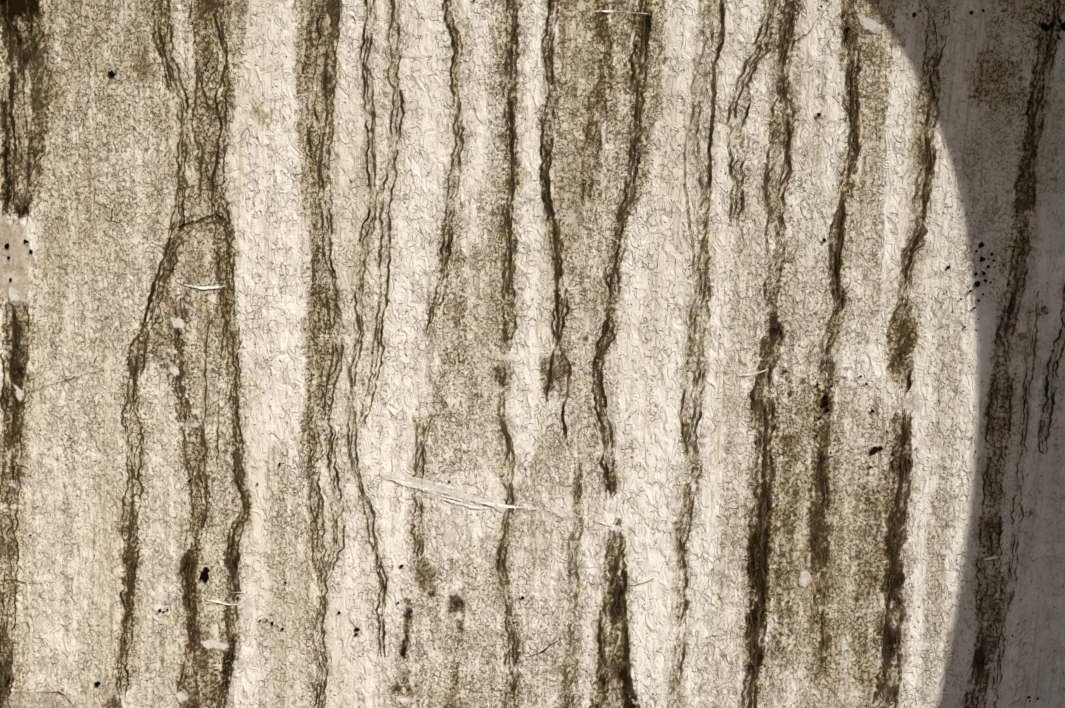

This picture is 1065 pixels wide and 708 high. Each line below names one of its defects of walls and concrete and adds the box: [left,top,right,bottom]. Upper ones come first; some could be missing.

leakage [0,0,259,708]
leakage [292,0,413,708]
leakage [426,0,522,349]
leakage [495,366,515,585]
leakage [504,596,524,708]
leakage [539,0,667,498]
leakage [589,520,641,708]
leakage [677,466,699,620]
leakage [681,0,725,453]
leakage [728,0,917,708]
leakage [887,10,950,394]
leakage [960,0,1065,708]